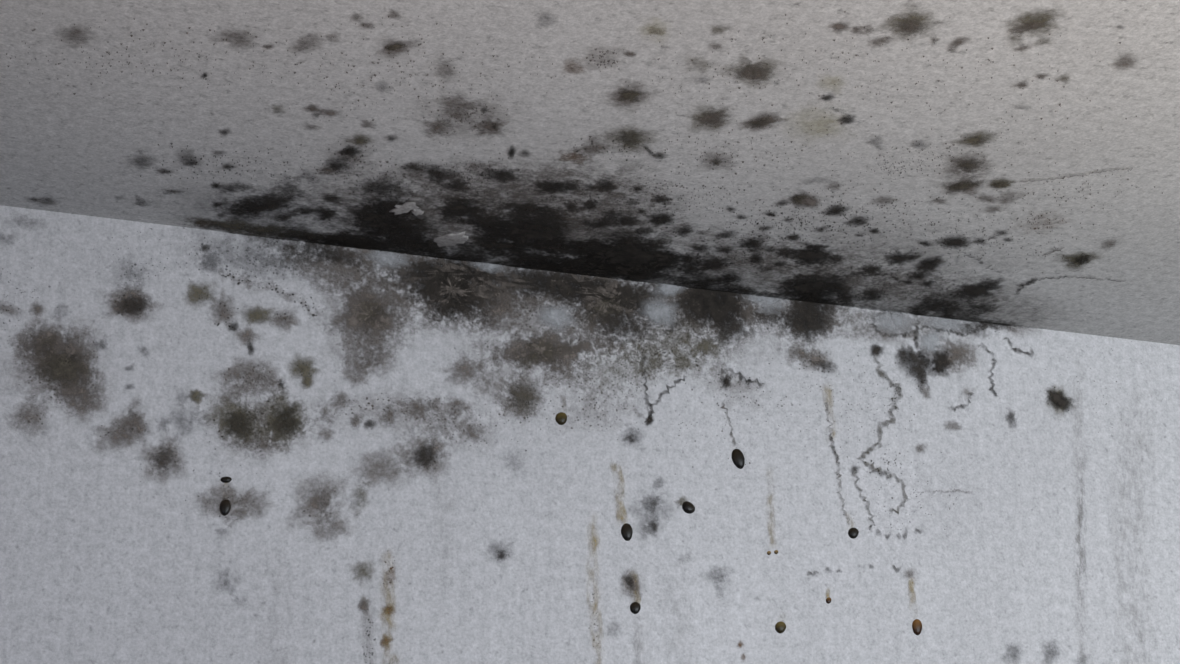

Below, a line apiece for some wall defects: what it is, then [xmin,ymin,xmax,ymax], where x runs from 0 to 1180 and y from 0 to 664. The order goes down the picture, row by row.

damp [833,11,928,81]
damp [1013,13,1061,66]
damp [151,27,1106,449]
damp [111,264,151,316]
damp [17,328,105,424]
crack [643,372,685,425]
damp [101,413,147,445]
damp [148,445,178,473]
damp [415,440,441,470]
crack [835,323,963,538]